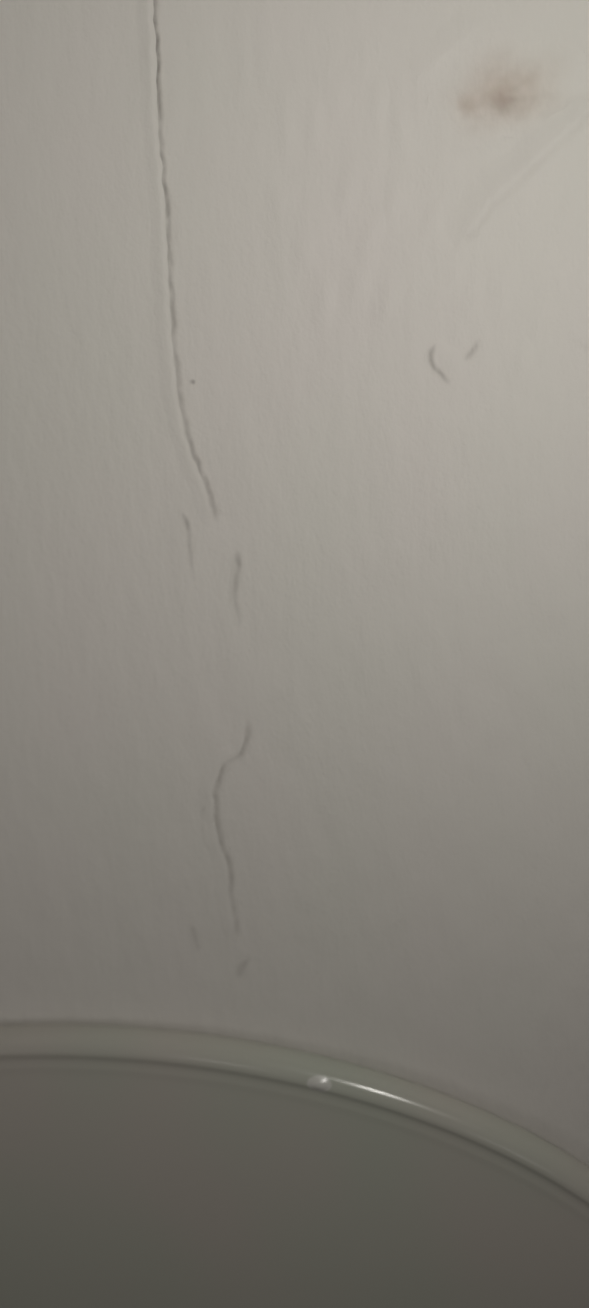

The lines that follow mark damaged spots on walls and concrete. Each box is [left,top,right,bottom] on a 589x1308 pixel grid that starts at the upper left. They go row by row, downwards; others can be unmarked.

crack [136,0,220,528]